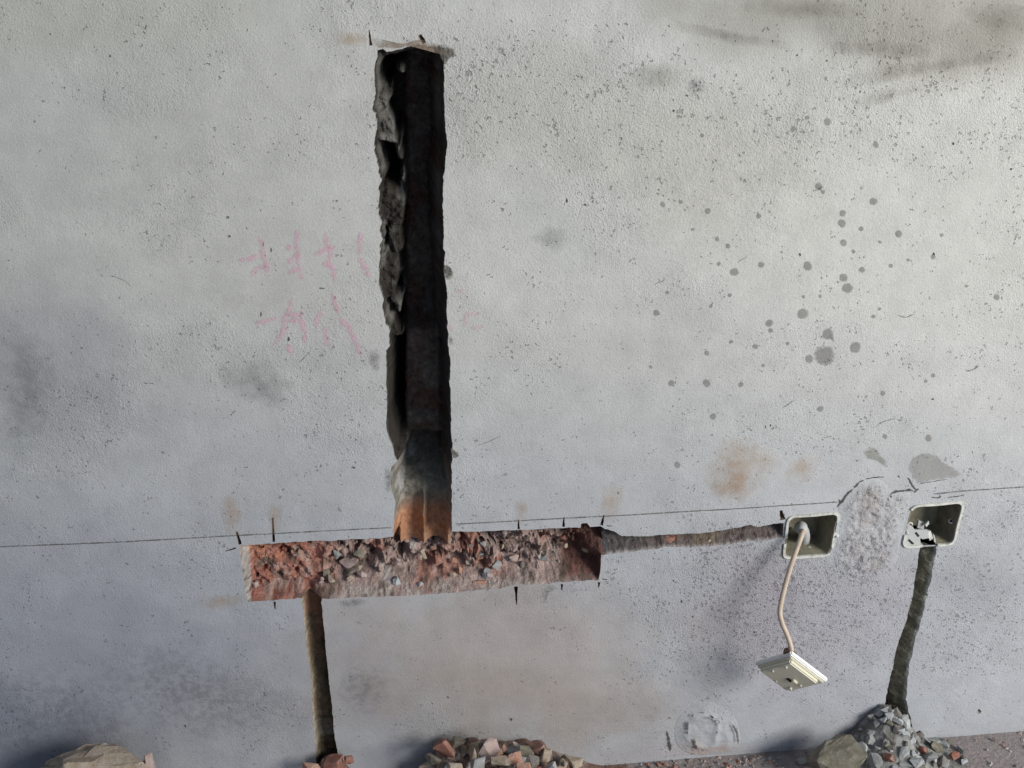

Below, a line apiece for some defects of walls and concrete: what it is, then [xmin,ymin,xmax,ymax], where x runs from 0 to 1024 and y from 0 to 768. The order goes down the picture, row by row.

spalling [434,46,454,62]
crack [459,476,1021,524]
crack [2,528,380,547]
spalling [313,549,367,584]
spalling [418,541,524,580]